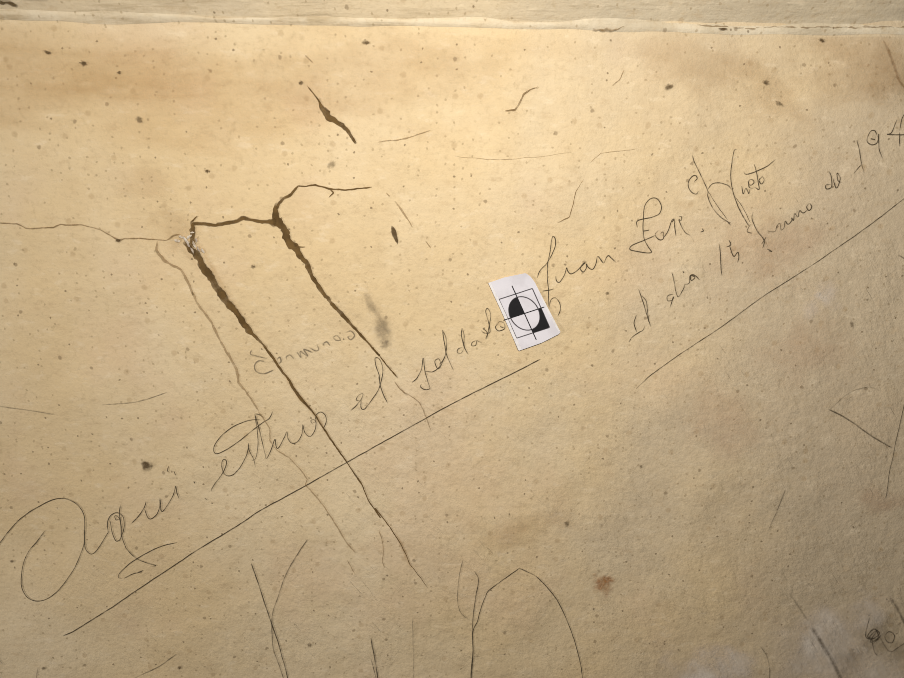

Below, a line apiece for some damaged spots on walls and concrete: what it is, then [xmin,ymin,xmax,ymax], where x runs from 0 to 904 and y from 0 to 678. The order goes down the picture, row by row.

crack [308,87,356,143]
crack [2,184,430,585]